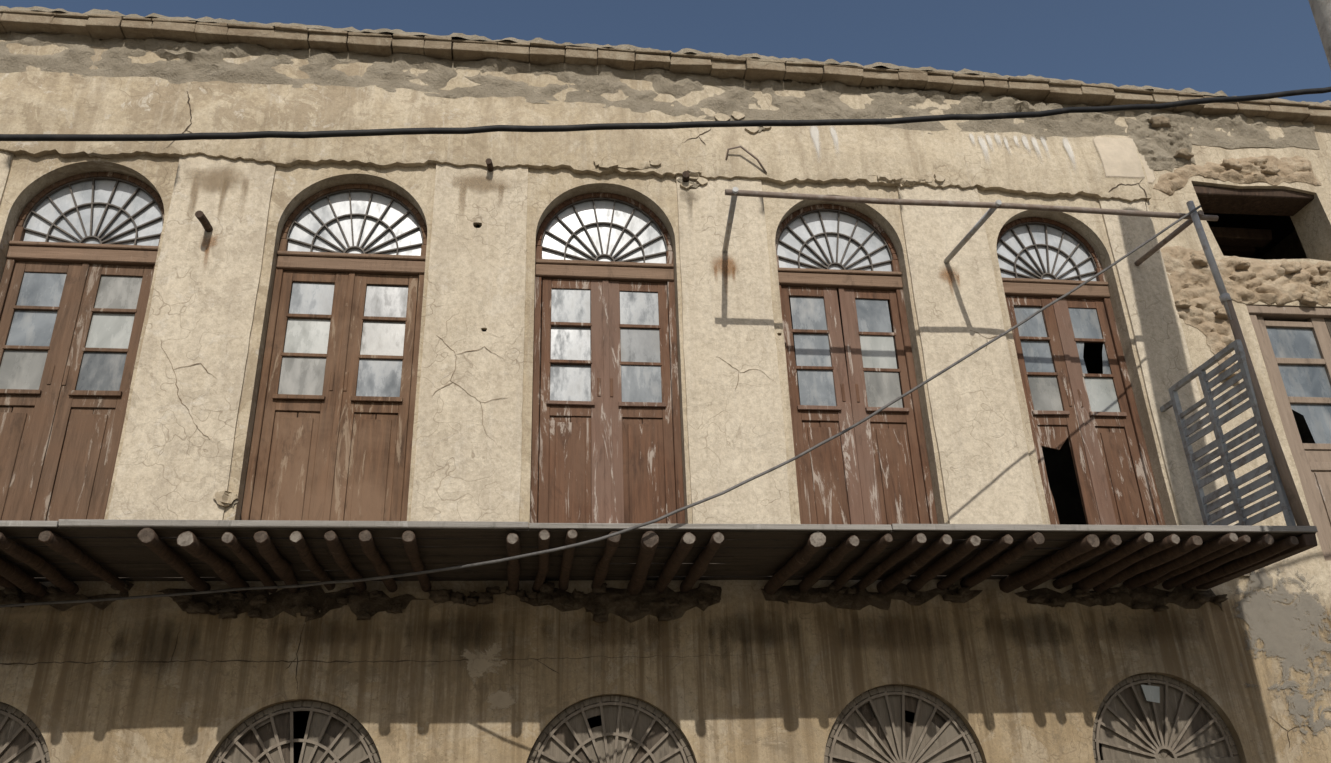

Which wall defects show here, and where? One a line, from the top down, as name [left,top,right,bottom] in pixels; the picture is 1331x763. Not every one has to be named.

crack [164,92,214,149]
spalling [0,31,1321,196]
rust [715,258,735,276]
crack [0,624,766,694]